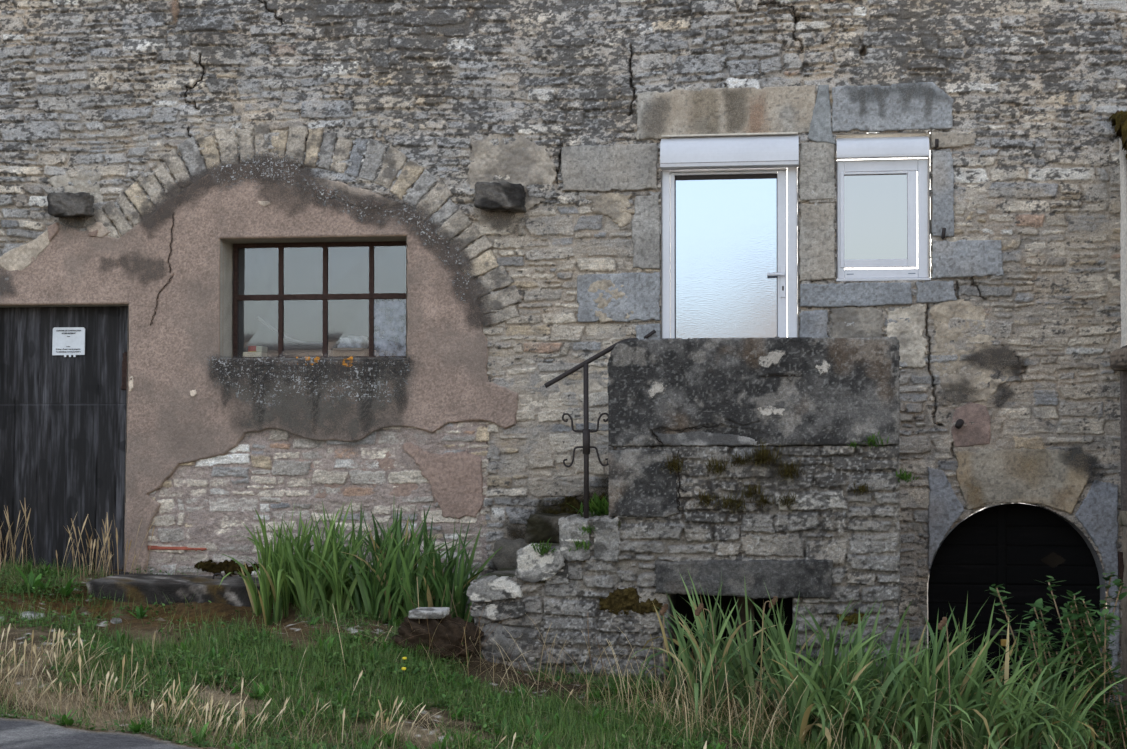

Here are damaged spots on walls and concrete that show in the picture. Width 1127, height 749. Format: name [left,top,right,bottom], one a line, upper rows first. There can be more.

crack [757,2,809,49]
crack [184,56,205,138]
damp [102,256,165,283]
crack [150,214,174,326]
damp [216,359,412,444]
peeling [146,420,490,579]